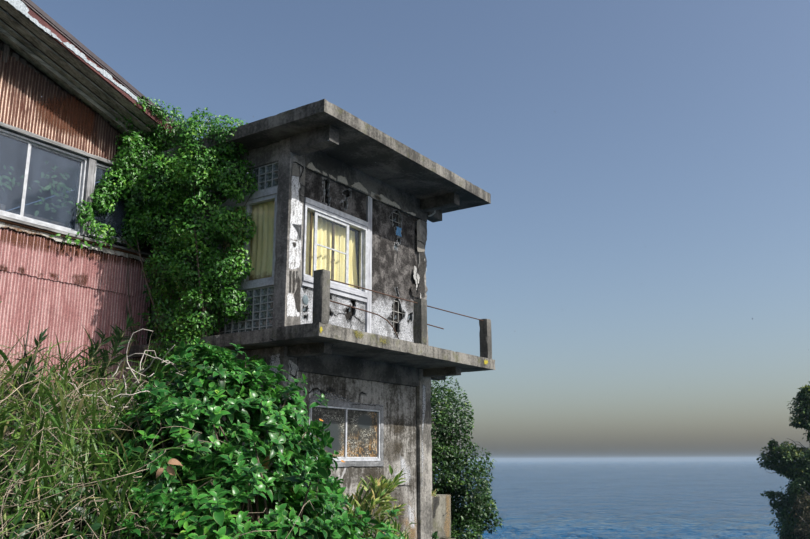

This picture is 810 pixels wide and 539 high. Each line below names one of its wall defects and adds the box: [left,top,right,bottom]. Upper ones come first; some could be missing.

peeling [5,0,143,105]
corrosion [36,97,95,138]
spalling [322,178,352,210]
peeling [287,164,309,320]
spalling [344,299,357,323]
damp [386,420,410,484]
damp [367,472,414,532]